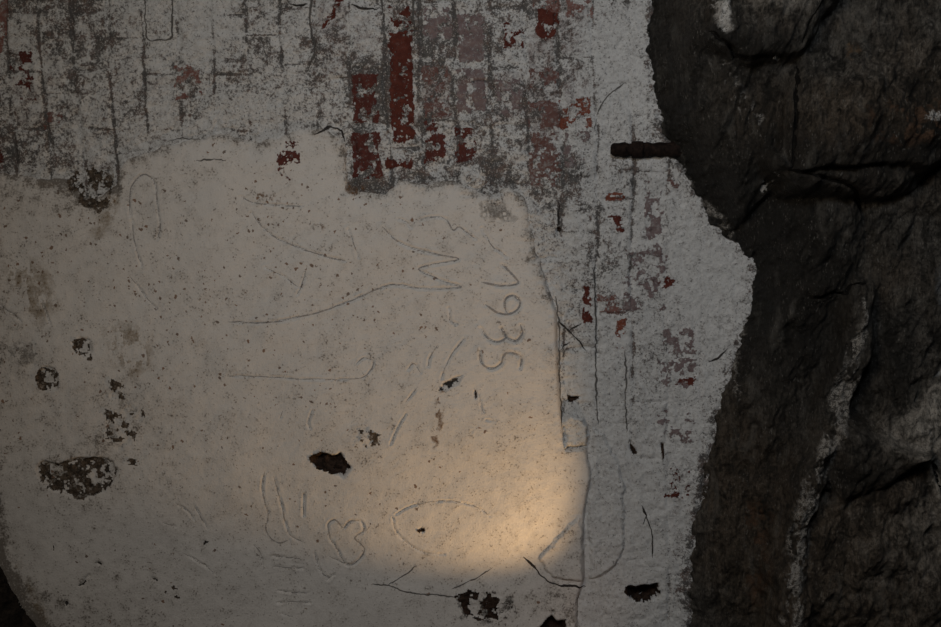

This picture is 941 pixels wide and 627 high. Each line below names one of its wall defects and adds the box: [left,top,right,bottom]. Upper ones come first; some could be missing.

peeling [322,0,344,29]
peeling [350,0,594,187]
spalling [72,338,92,360]
spalling [35,367,59,390]
spalling [108,379,125,399]
spalling [104,409,145,442]
spalling [309,452,351,475]
spalling [38,457,117,500]
spalling [454,589,513,621]
spalling [624,583,660,603]